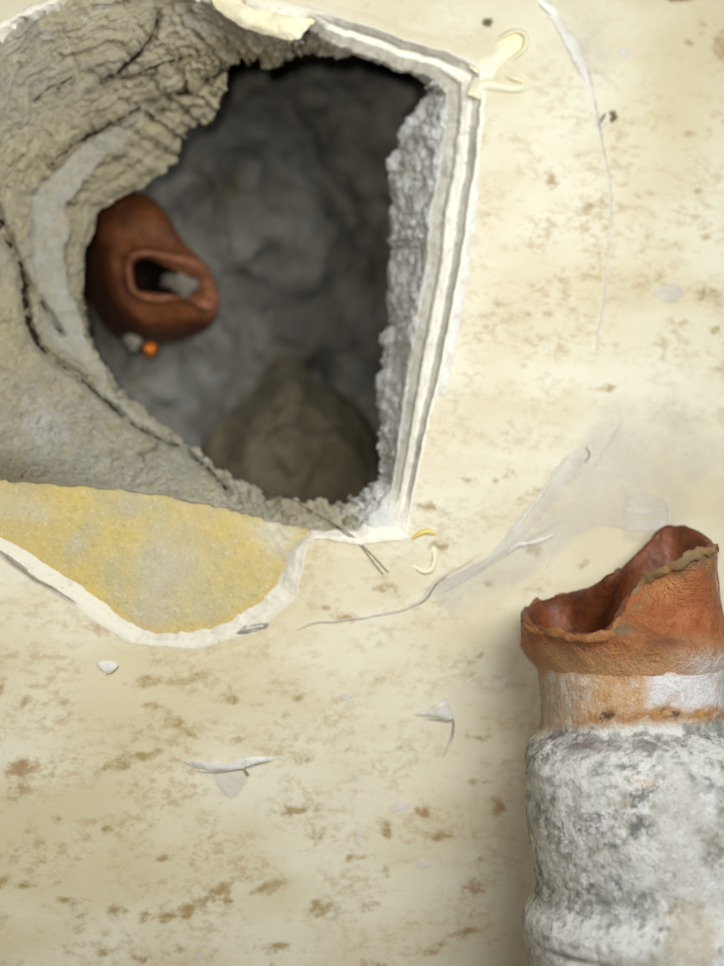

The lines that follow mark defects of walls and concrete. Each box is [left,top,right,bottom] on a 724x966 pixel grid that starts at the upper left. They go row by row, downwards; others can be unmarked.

spalling [0,0,486,650]
rust [631,543,719,595]
rust [520,597,621,644]
peeling [415,699,455,755]
peeling [185,756,275,795]